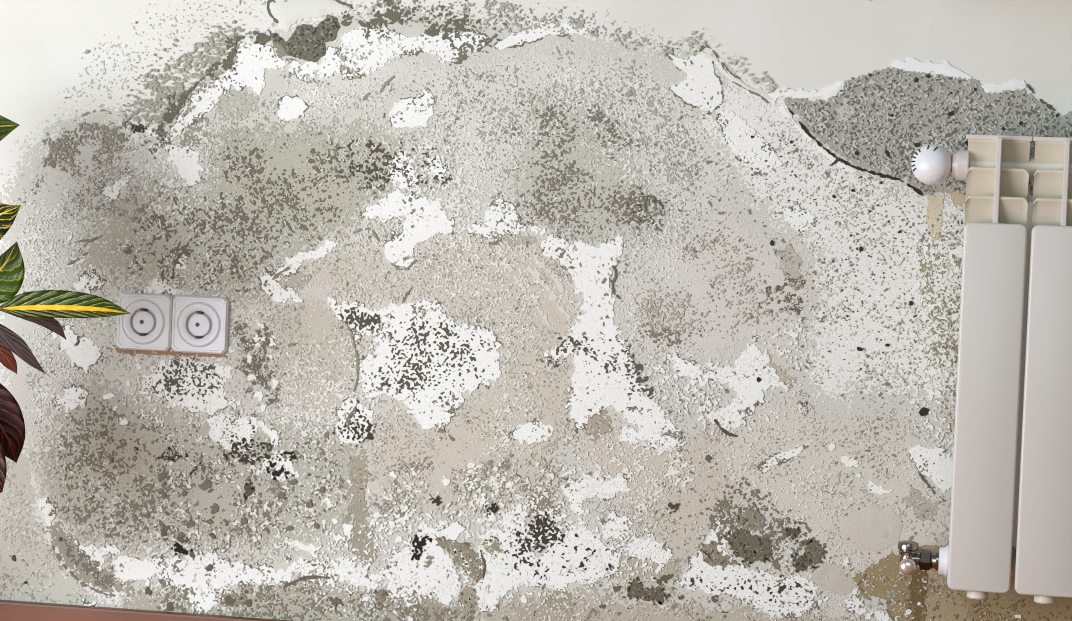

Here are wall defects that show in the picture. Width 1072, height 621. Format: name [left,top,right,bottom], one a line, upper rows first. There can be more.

leakage [163,40,288,143]
crack [699,45,923,196]
spalling [0,0,1072,460]
leakage [0,450,112,608]
peeling [0,302,211,527]
leakage [379,516,466,611]
peeling [53,353,891,621]
leakage [724,528,773,564]
leakage [791,553,811,573]
flaking render [898,462,952,522]
leakage [912,572,1072,621]
peeling [1012,180,1034,548]